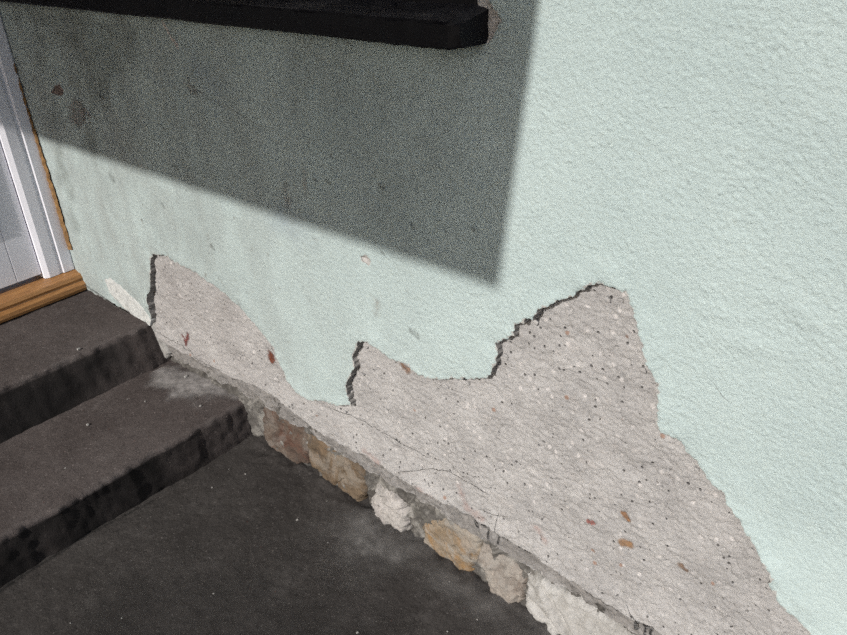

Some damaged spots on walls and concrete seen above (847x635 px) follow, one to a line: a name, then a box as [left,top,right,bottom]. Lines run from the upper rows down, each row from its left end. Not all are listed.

flaking render [154,255,810,635]